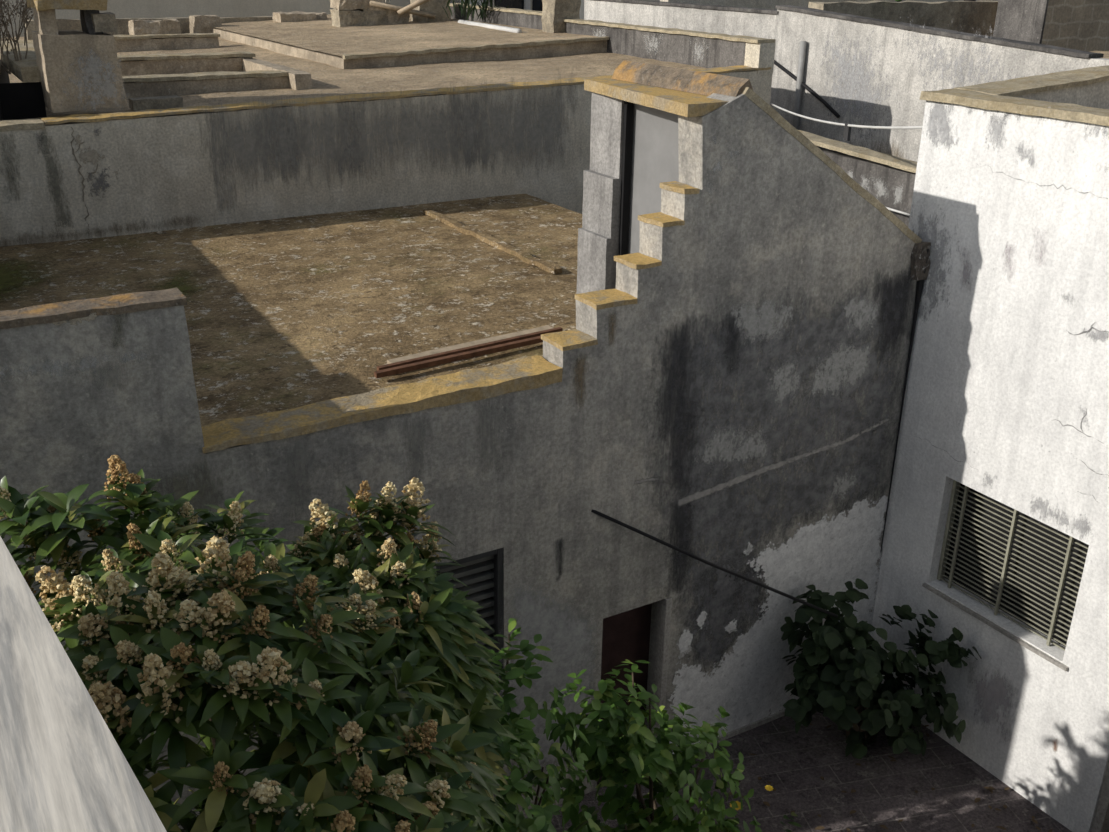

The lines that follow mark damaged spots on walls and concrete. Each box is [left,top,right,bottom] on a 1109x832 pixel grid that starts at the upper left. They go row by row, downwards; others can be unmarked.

leakage [19,132,145,243]
crack [71,127,98,231]
leakage [223,91,563,176]
crack [990,167,1101,198]
crack [1055,408,1109,502]
peeling [668,474,890,744]